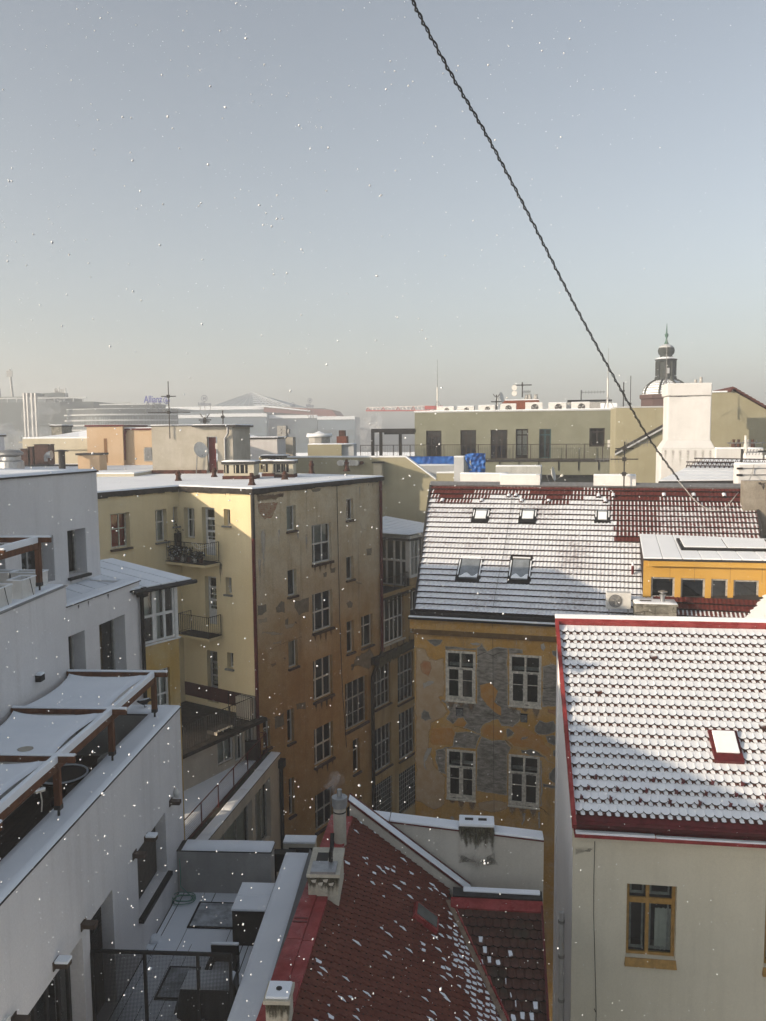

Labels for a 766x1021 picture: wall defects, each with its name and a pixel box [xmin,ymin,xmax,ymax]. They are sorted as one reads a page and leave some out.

peeling [377,639,557,809]
leakage [459,826,495,847]